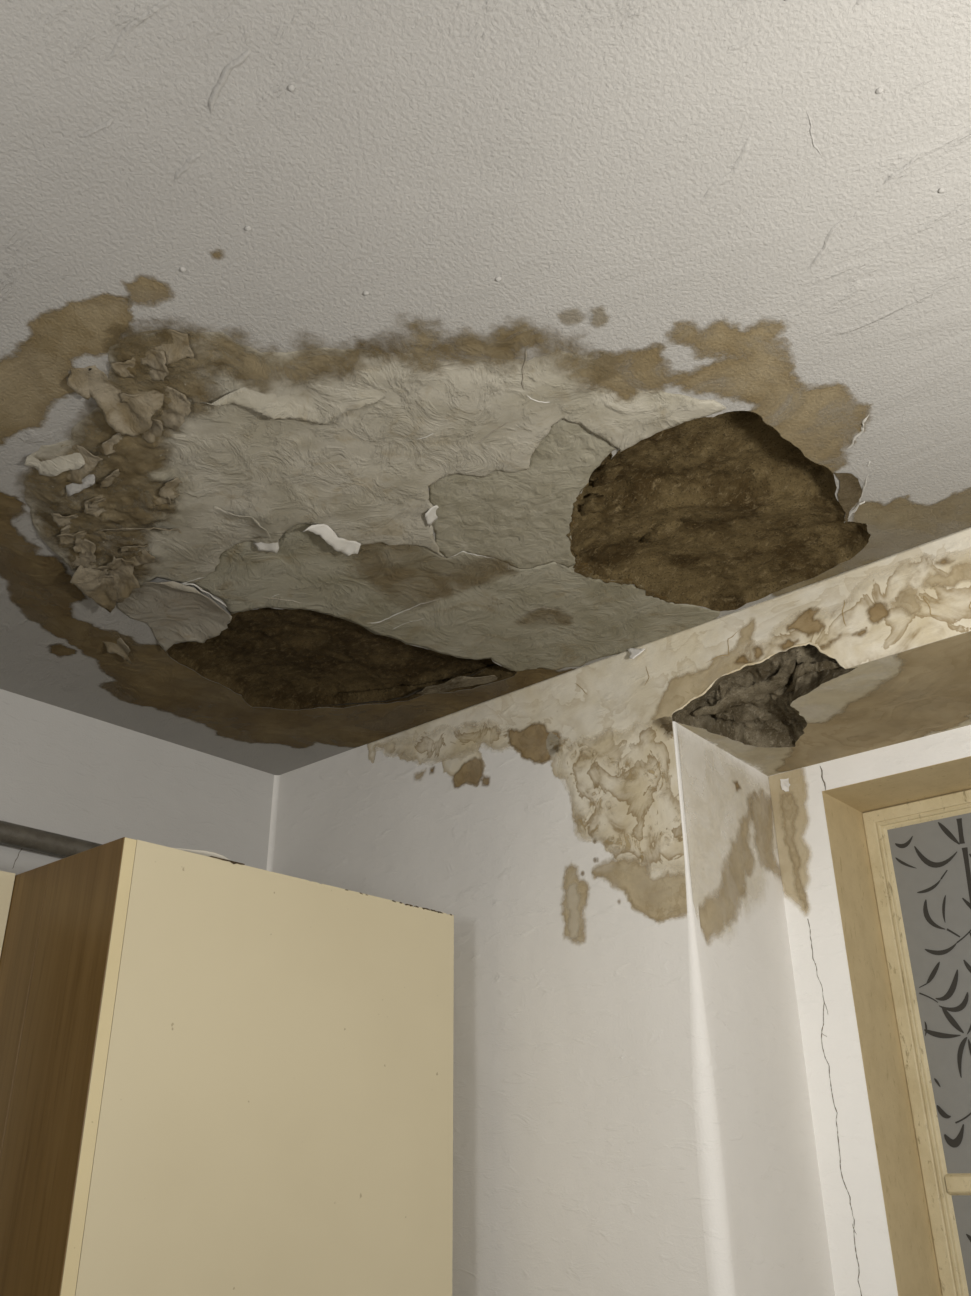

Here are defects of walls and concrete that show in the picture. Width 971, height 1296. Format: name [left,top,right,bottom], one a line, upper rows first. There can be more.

peeling [24,329,871,710]
spalling [672,642,857,748]